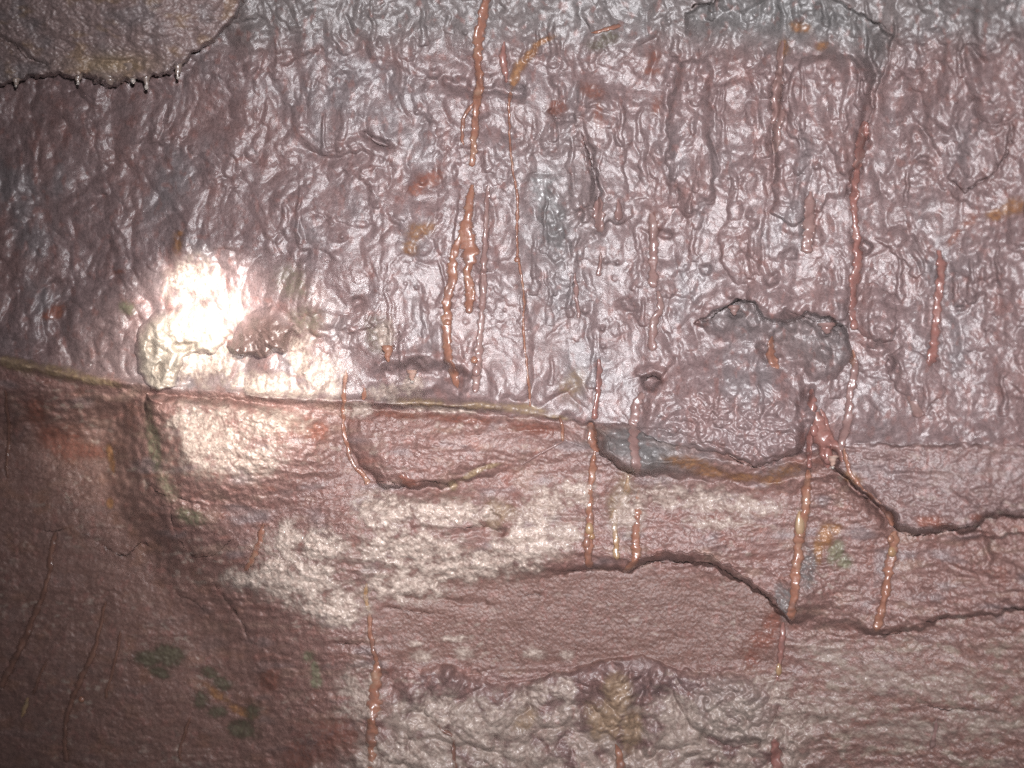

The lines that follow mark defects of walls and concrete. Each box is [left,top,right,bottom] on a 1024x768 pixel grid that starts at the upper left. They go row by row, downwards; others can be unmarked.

rust [460,0,491,167]
rust [440,184,490,393]
rust [647,213,664,351]
rust [848,121,870,330]
rust [926,200,1023,366]
rust [363,584,383,768]
efflorescence [220,480,594,629]
rust [581,359,603,568]
rust [609,392,645,574]
crack [635,560,783,614]
rust [770,350,900,701]
crack [835,469,1023,537]